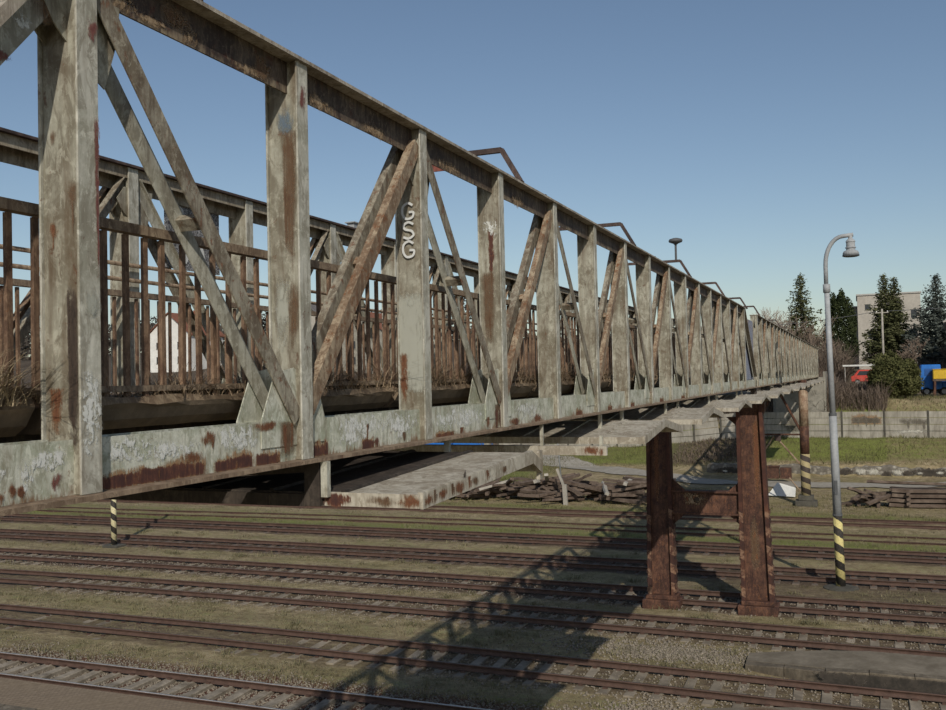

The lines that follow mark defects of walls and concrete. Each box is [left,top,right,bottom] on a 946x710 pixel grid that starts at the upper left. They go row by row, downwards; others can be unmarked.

rust [113,0,165,29]
rust [50,388,62,434]
peeling [81,369,199,461]
rust [0,484,25,504]
peeling [18,451,66,492]
rust [102,421,294,490]
rust [324,493,351,507]
rust [362,424,379,449]
rust [374,470,489,508]